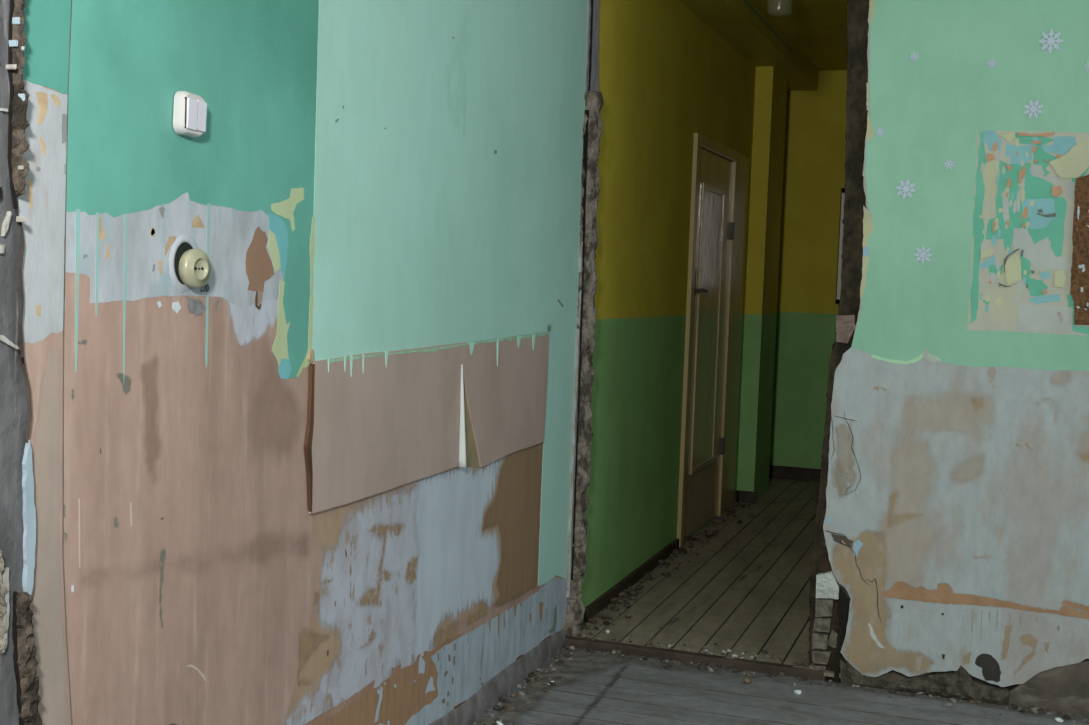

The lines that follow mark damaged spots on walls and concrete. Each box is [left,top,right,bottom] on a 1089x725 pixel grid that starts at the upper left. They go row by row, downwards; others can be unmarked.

damp [116,354,163,487]
spalling [0,0,315,725]
spalling [284,0,604,725]
crack [831,411,861,496]
spalling [793,0,1089,716]